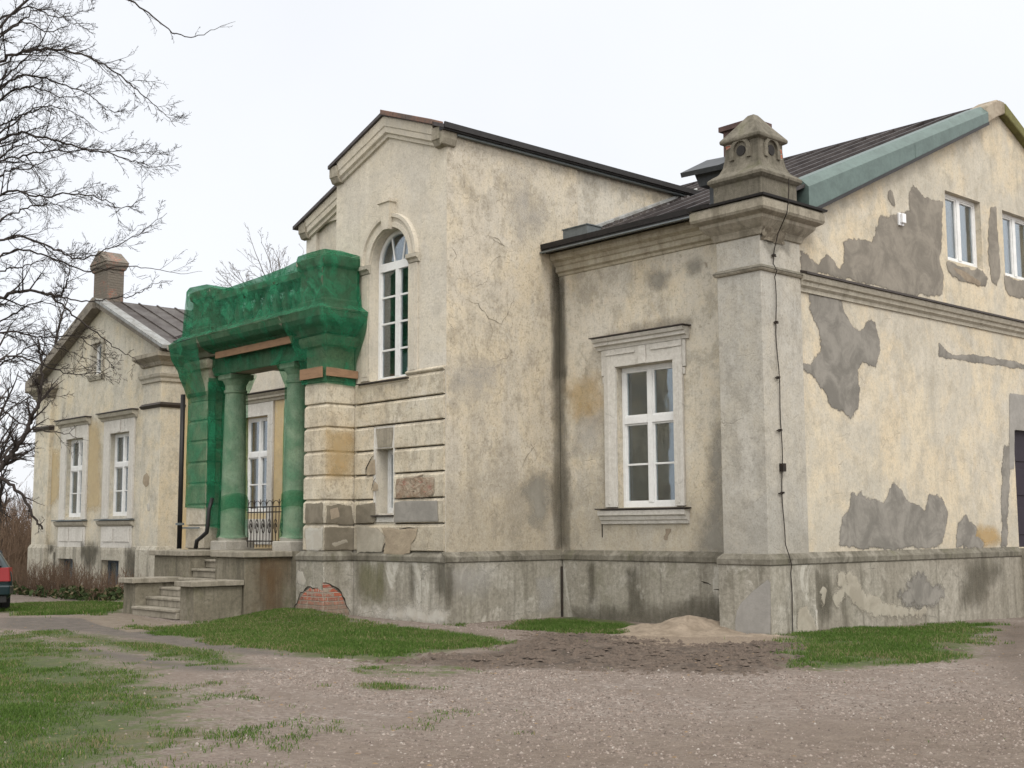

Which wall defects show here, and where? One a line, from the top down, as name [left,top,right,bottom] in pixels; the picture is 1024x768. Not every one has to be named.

water stain [523,269,567,545]
flaking render [294,583,351,615]
water stain [378,565,451,624]
water stain [581,572,720,623]
peeling [797,571,927,632]